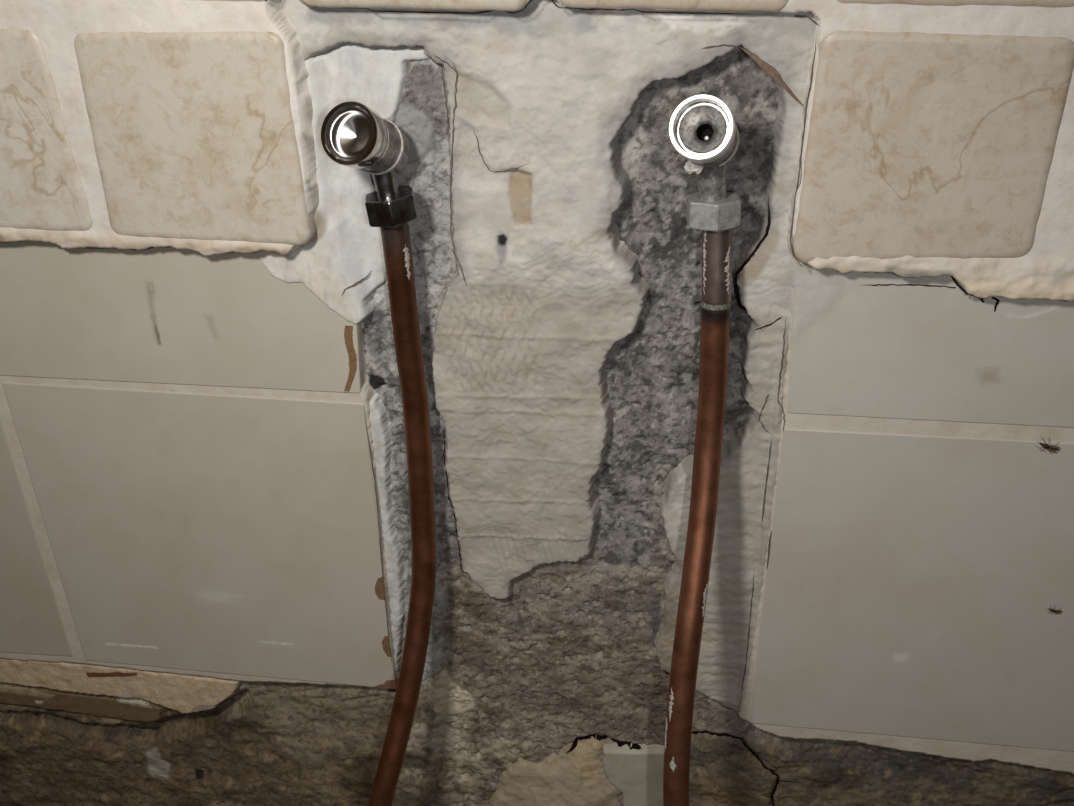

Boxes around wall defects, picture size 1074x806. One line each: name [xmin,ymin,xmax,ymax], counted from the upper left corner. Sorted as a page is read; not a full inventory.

spalling [343,281,412,660]
spalling [392,45,803,806]
spalling [0,659,398,806]
spalling [689,690,1074,806]